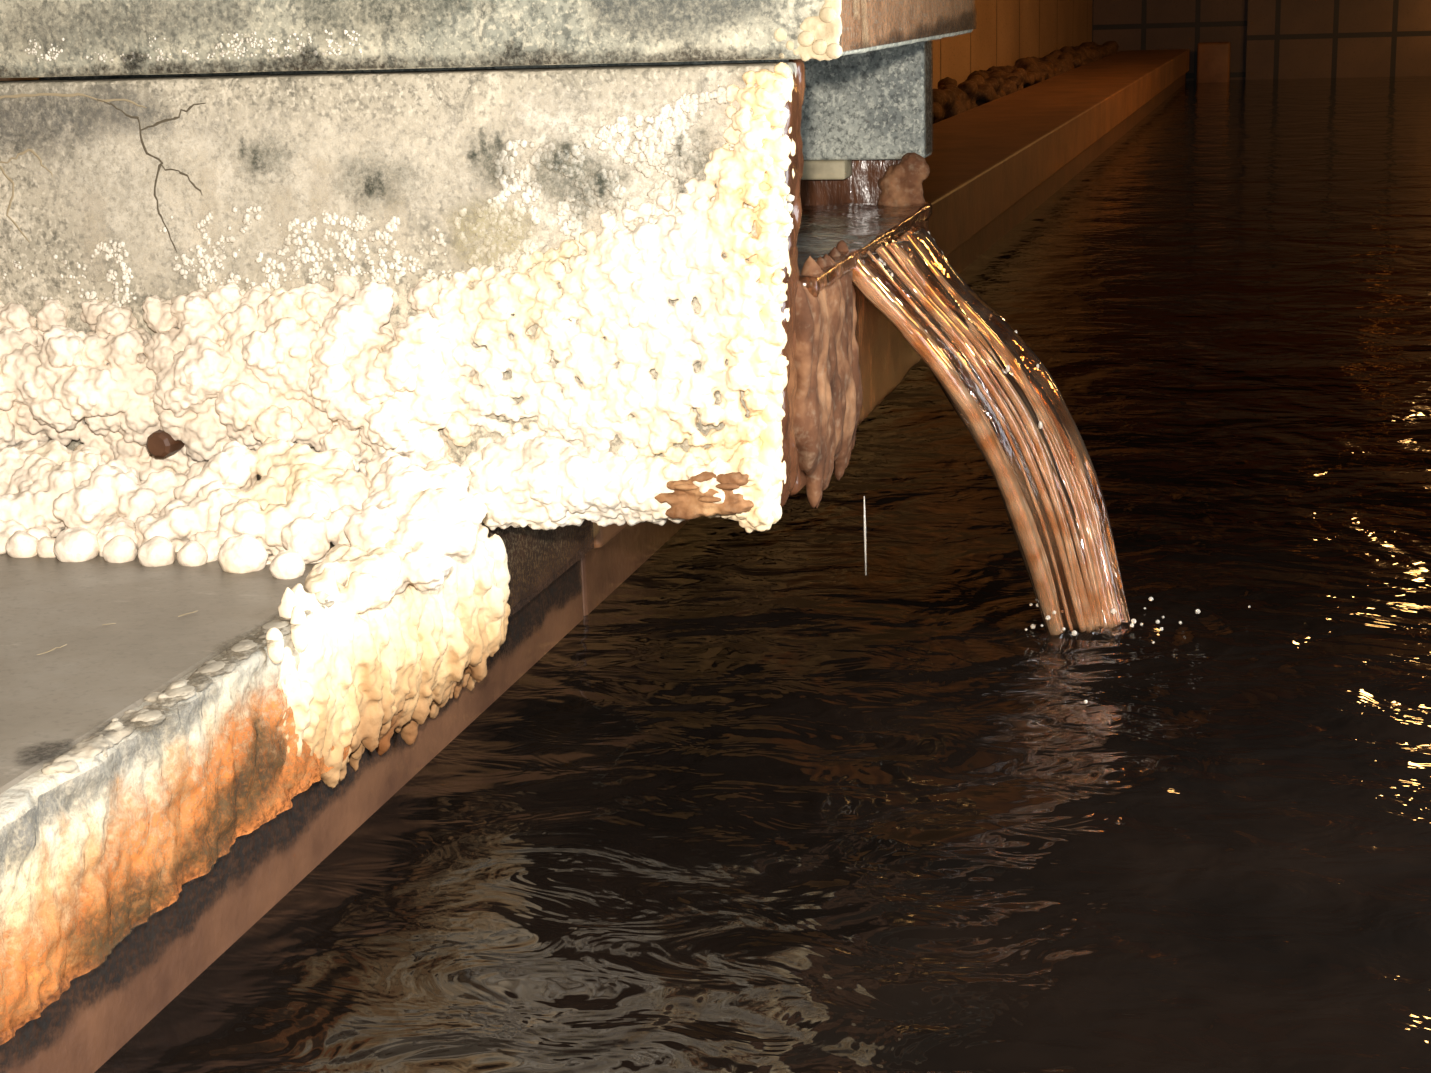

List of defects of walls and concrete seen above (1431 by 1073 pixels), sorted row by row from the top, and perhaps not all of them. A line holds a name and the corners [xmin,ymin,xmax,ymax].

crack [97,99,205,252]
rust [0,689,352,1043]